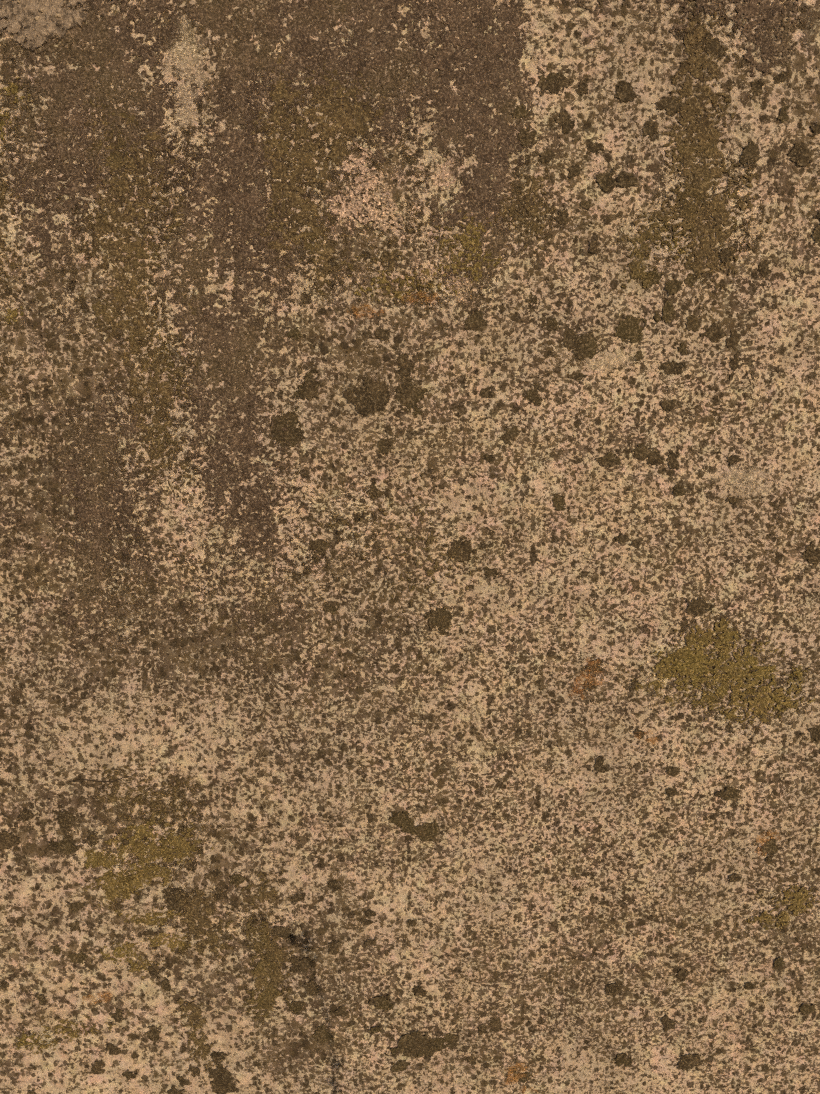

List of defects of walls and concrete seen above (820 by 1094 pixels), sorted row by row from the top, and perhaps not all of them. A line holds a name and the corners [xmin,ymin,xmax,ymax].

leakage [0,0,557,753]